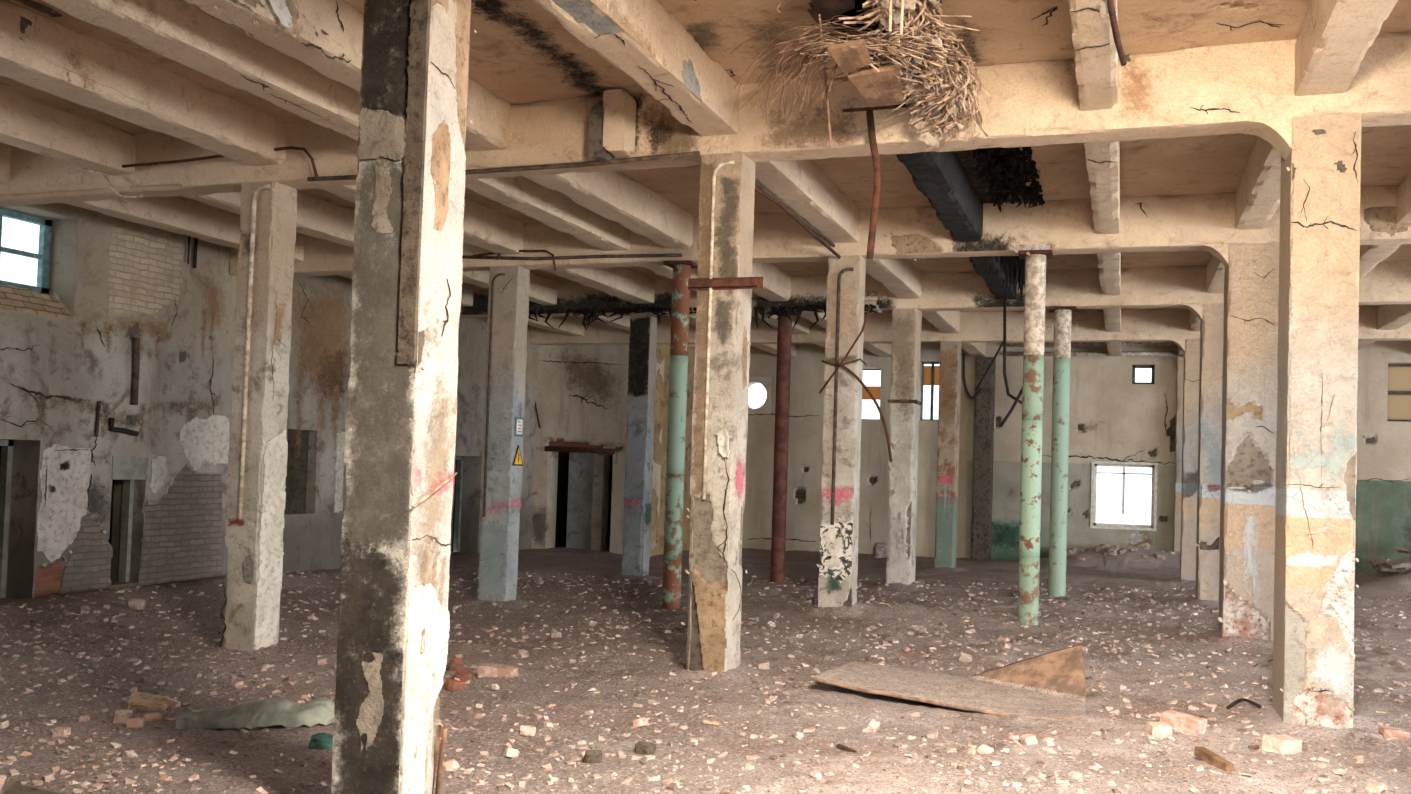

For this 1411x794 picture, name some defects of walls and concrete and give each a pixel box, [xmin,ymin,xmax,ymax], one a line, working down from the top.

flaking render [430,0,477,232]
crack [1190,104,1240,114]
crack [1292,179,1357,231]
crack [0,345,97,512]
flaking render [1225,392,1276,493]
flaking render [1342,453,1356,520]
flaking render [35,515,113,598]
flaking render [1218,548,1359,729]